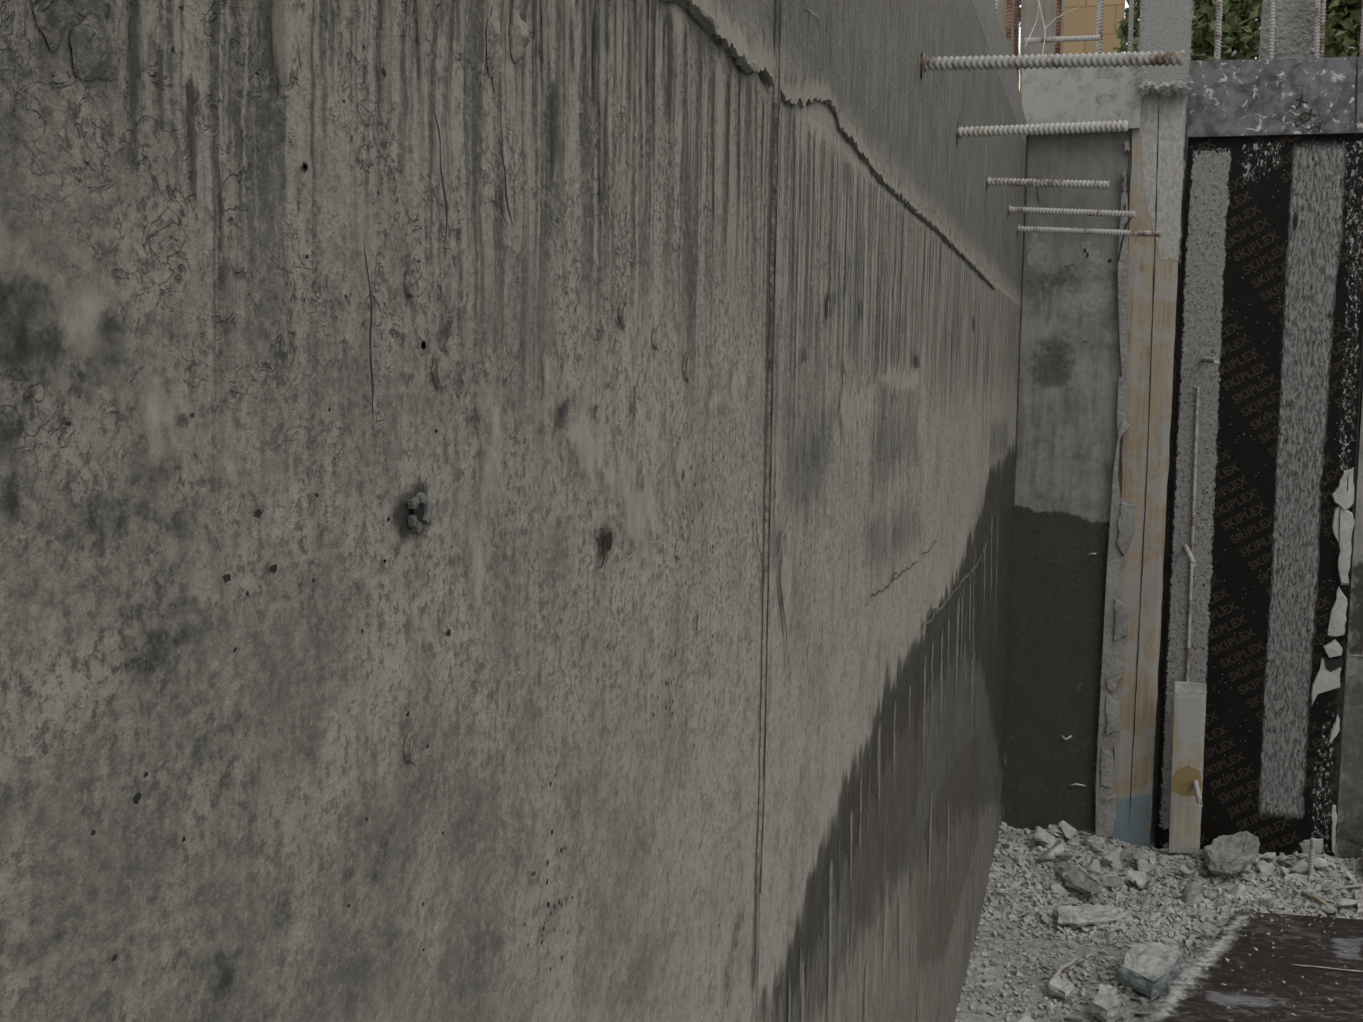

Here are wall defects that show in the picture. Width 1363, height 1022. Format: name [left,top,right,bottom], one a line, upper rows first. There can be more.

damp [129,0,164,163]
damp [188,77,198,199]
damp [273,0,285,87]
crack [433,107,448,246]
crack [499,138,513,225]
damp [528,0,767,218]
damp [0,254,121,383]
crack [364,243,378,423]
crack [866,541,937,606]
damp [762,127,1112,1022]
damp [1345,562,1363,659]